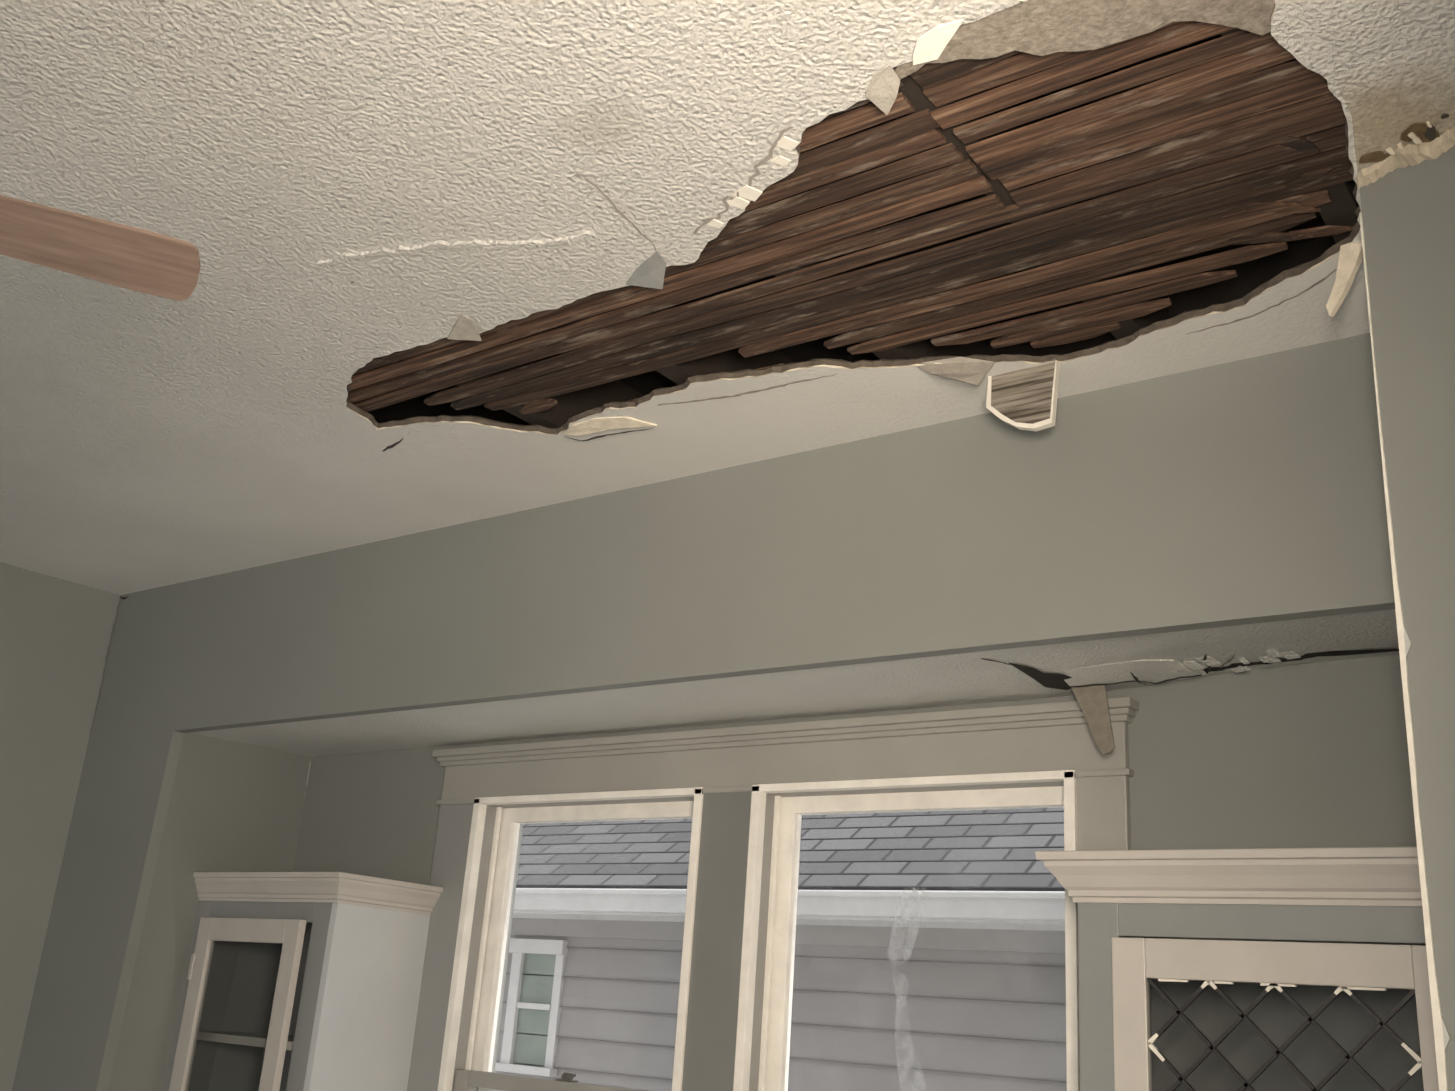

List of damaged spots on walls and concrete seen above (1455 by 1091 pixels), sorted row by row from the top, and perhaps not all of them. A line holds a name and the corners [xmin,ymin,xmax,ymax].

flaking render [865,0,1276,115]
crack [576,173,661,255]
crack [694,126,798,234]
crack [1167,649,1399,677]